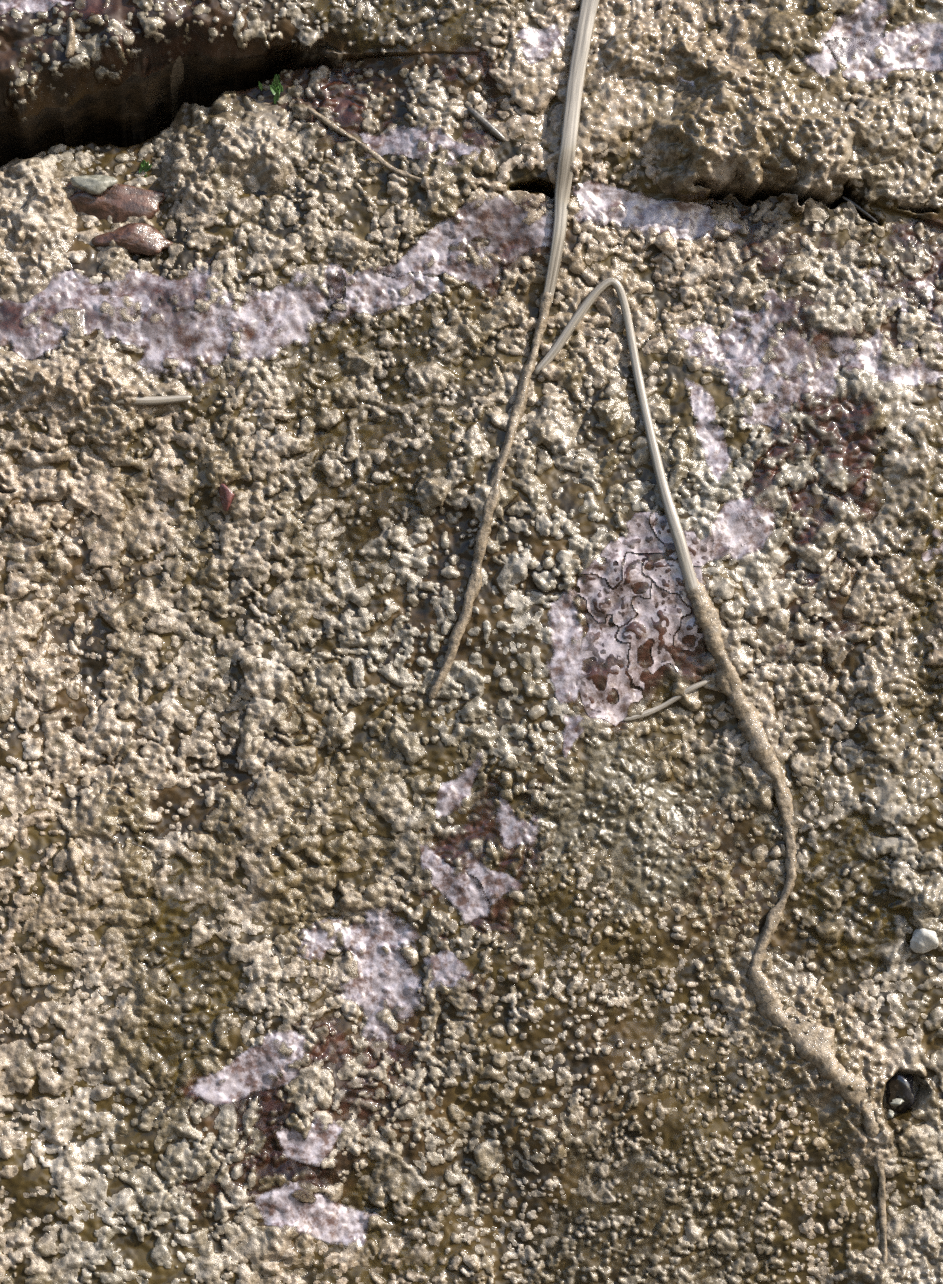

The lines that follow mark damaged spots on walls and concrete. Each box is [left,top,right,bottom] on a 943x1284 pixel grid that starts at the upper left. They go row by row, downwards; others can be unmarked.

crack [0,39,343,167]
crack [841,194,877,224]